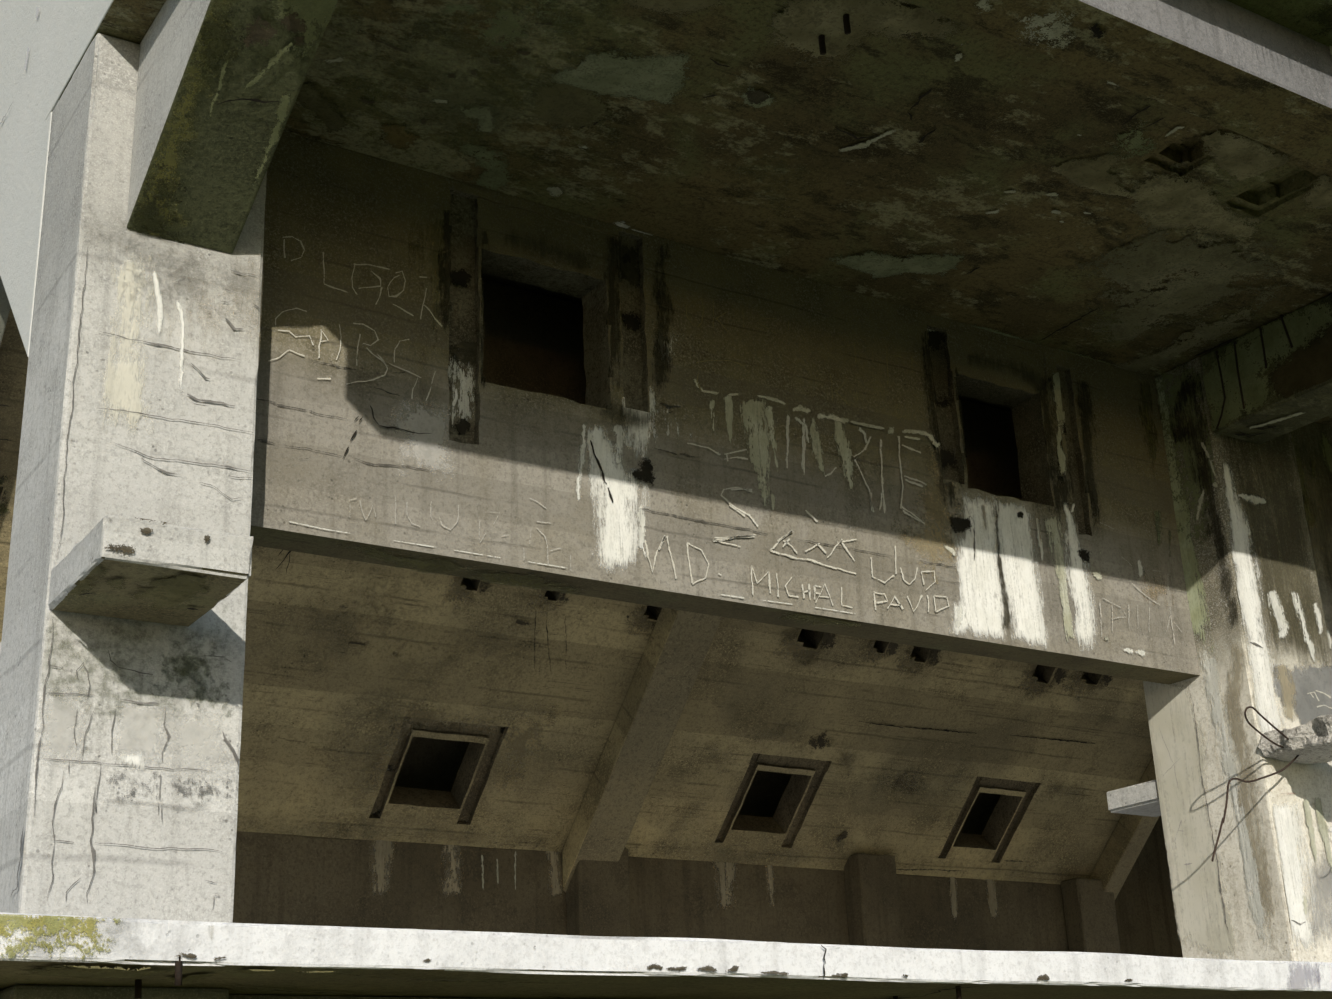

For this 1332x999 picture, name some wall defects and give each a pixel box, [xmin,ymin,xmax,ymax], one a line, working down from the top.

damp [245,0,338,89]
damp [254,92,291,186]
spalling [1046,106,1290,240]
damp [1139,377,1332,945]
crack [11,619,218,903]
damp [0,914,121,960]
damp [1289,961,1322,989]